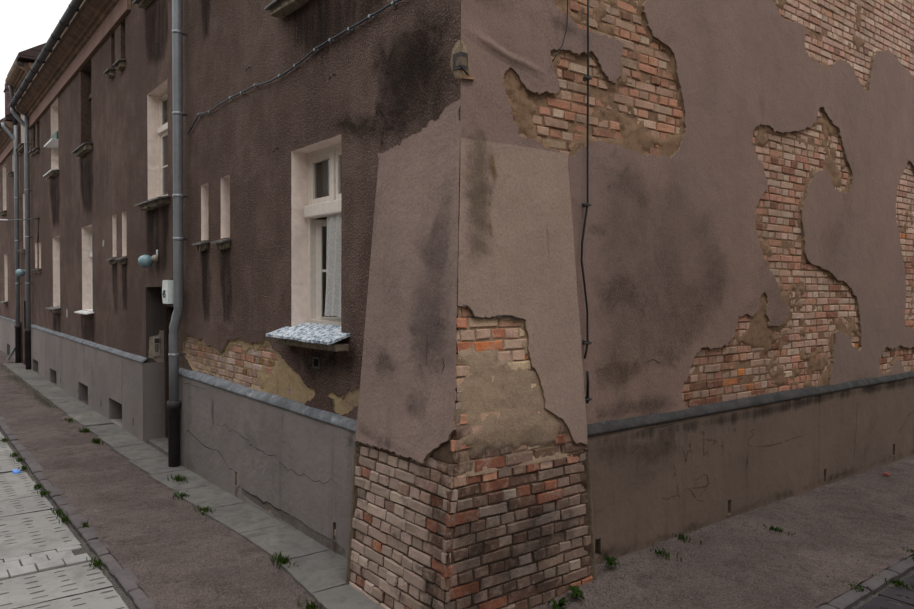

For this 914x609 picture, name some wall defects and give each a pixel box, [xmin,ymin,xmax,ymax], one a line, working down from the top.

flaking render [503,0,684,157]
flaking render [773,0,914,91]
flaking render [682,107,859,407]
flaking render [896,162,914,330]
flaking render [184,336,315,404]
crack [187,421,342,514]
spalling [242,282,593,609]
flaking render [879,346,914,373]